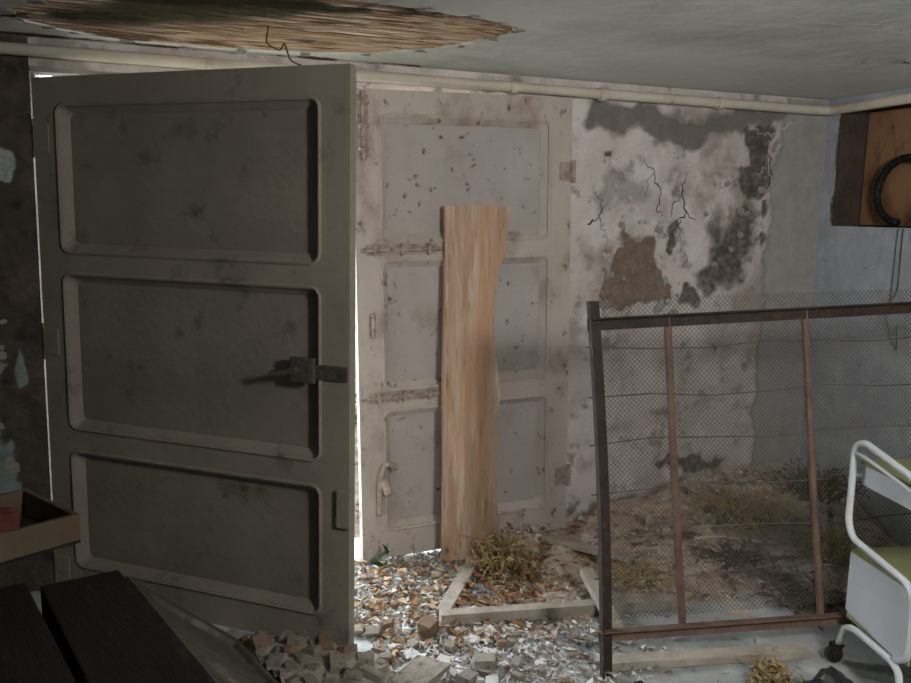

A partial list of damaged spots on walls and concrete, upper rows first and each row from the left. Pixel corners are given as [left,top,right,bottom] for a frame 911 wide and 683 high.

flaking render [0,147,16,183]
crack [587,191,605,231]
crack [643,156,695,243]
leakage [585,99,785,308]
flaking render [593,217,679,317]
flaking render [0,345,29,389]
flaking render [0,420,22,494]